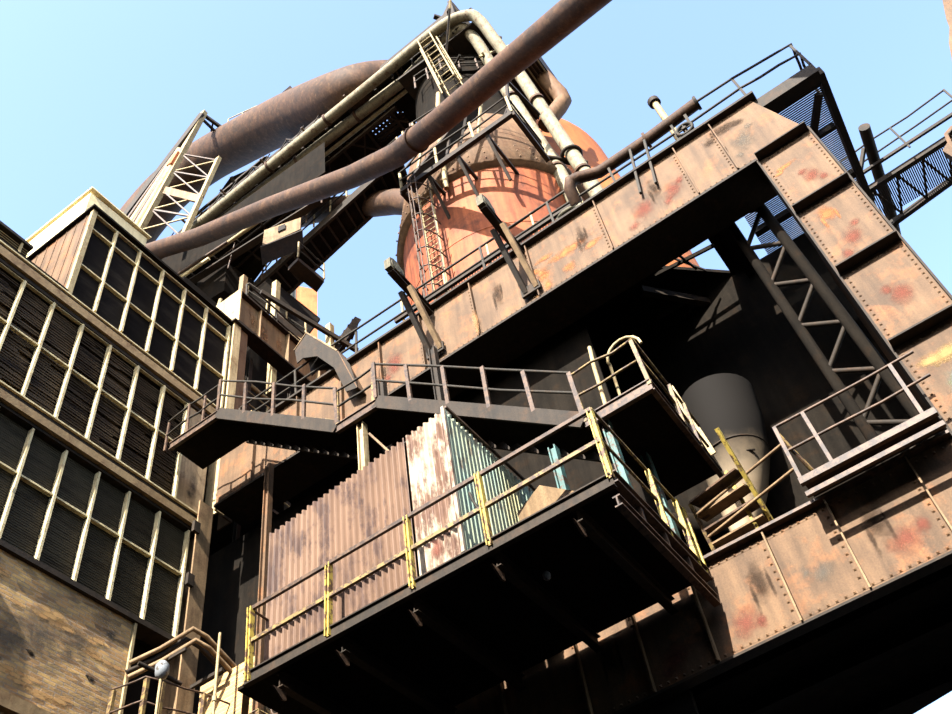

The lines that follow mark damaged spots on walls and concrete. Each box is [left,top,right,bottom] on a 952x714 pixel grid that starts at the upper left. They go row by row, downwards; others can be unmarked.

rust [534,239,597,298]